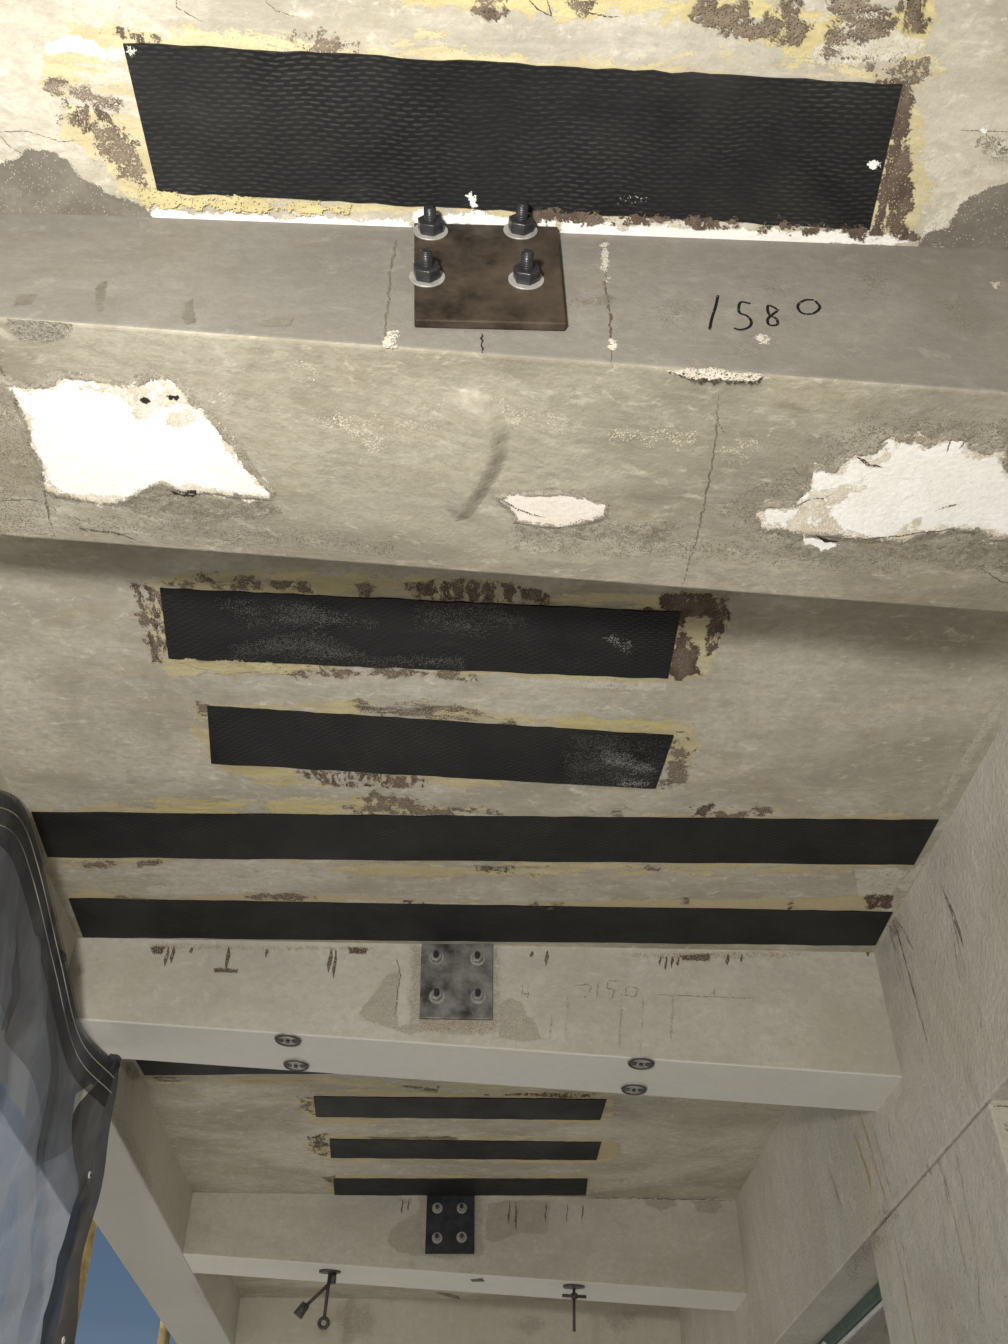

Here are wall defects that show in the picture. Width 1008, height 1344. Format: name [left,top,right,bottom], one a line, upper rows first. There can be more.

crack [529,0,618,18]
leakage [0,0,1008,250]
peeling [0,368,283,526]
peeling [491,487,683,549]
crack [681,395,724,587]
peeling [750,417,1008,583]